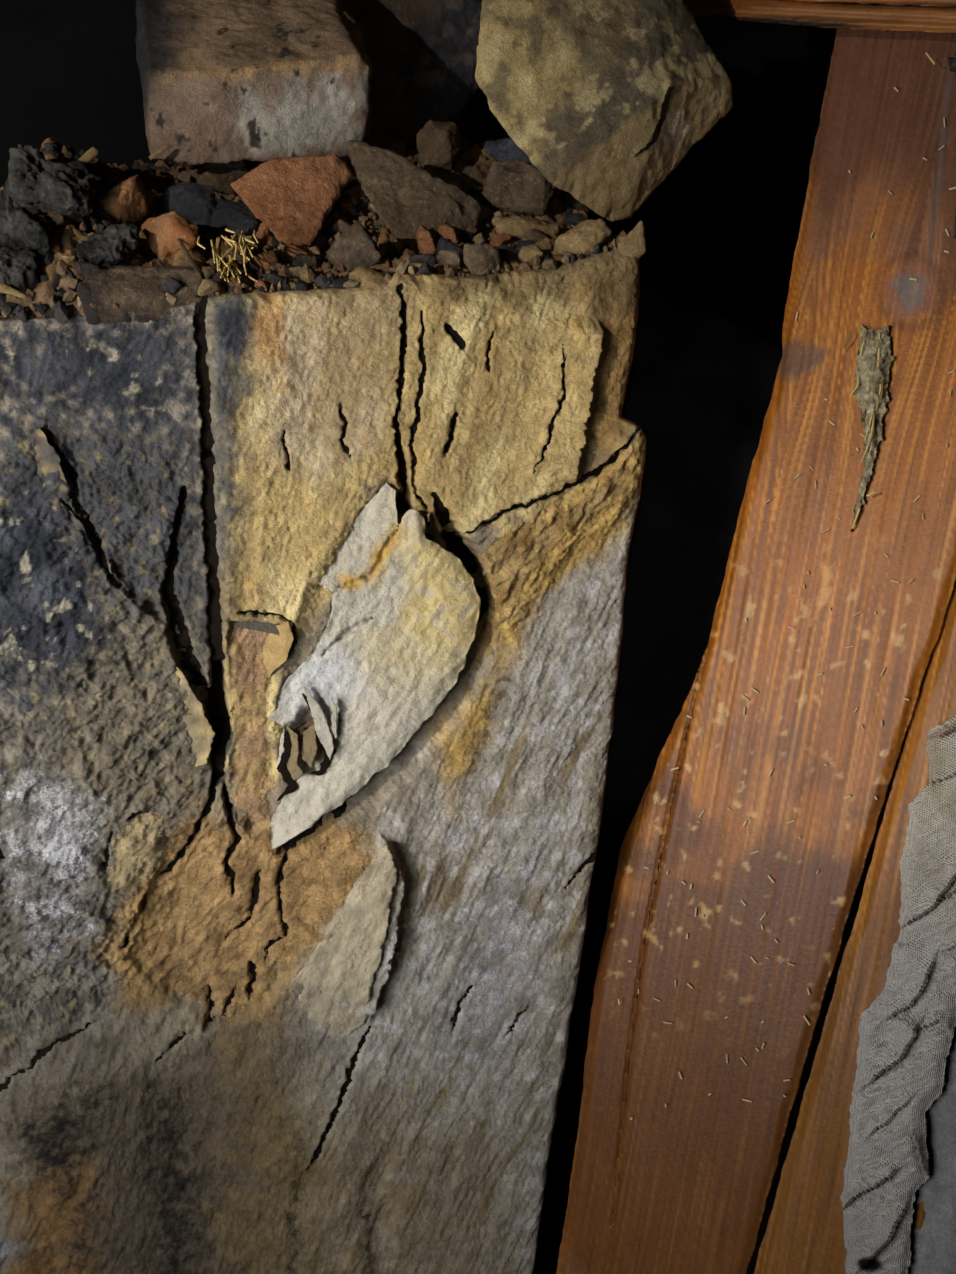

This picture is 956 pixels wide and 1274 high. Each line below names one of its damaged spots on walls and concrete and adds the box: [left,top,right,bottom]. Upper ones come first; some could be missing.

crack [339,408,351,457]
crack [392,286,641,558]
crack [38,427,123,587]
crack [155,295,298,1061]
crack [102,811,145,874]
crack [565,852,596,888]
crack [451,985,473,1029]
crack [506,1004,529,1035]
crack [0,1022,91,1092]